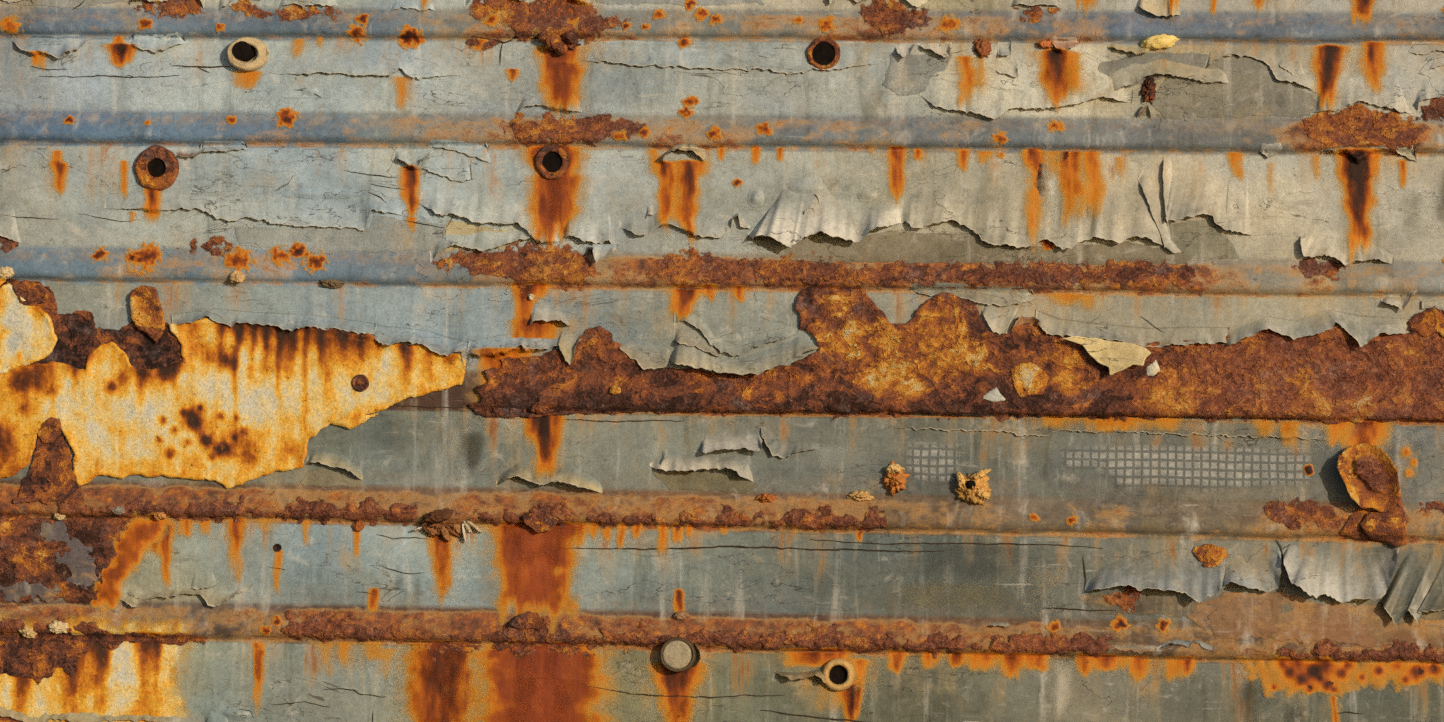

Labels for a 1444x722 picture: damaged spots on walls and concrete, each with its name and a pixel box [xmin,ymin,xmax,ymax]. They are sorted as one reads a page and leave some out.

peeling [1137,0,1181,17]
peeling [581,34,1444,119]
peeling [104,140,1251,264]
rust [433,0,1444,548]
peeling [1301,227,1394,266]
rust [29,286,183,370]
peeling [619,312,819,375]
peeling [649,424,822,482]
rust [0,494,418,684]
rust [253,502,1196,722]
peeling [1083,543,1444,654]
rust [1237,638,1444,722]